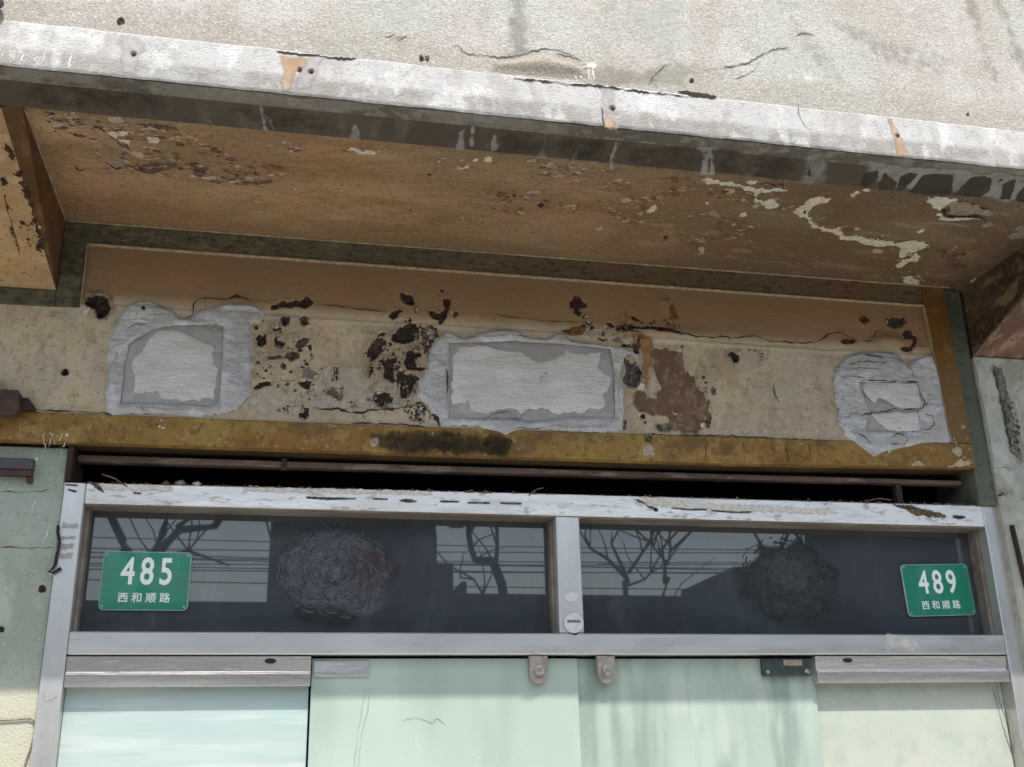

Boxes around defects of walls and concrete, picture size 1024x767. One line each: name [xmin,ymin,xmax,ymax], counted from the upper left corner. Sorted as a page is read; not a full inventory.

crack [458,32,816,126]
peeling [0,143,45,253]
peeling [42,110,289,186]
peeling [337,144,379,155]
peeling [427,156,492,176]
peeling [486,159,976,285]
spalling [927,196,995,228]
rust [271,297,314,310]
peeling [621,345,716,456]
crack [484,314,935,446]
water stain [375,431,512,456]